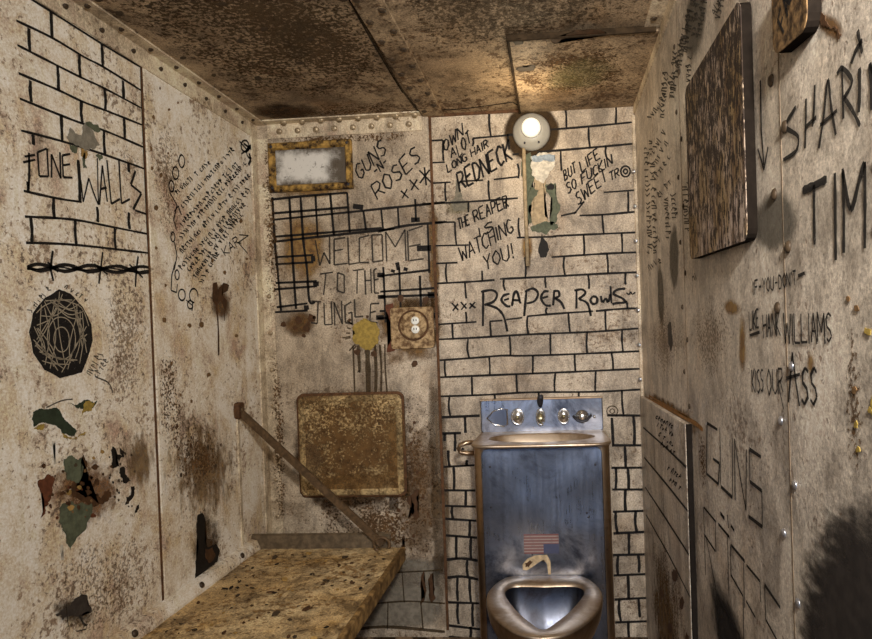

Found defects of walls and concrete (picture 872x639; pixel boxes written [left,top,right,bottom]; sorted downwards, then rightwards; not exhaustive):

peeling [521,152,560,235]
peeling [32,399,139,560]
rust [272,353,449,603]
rust [846,329,863,469]